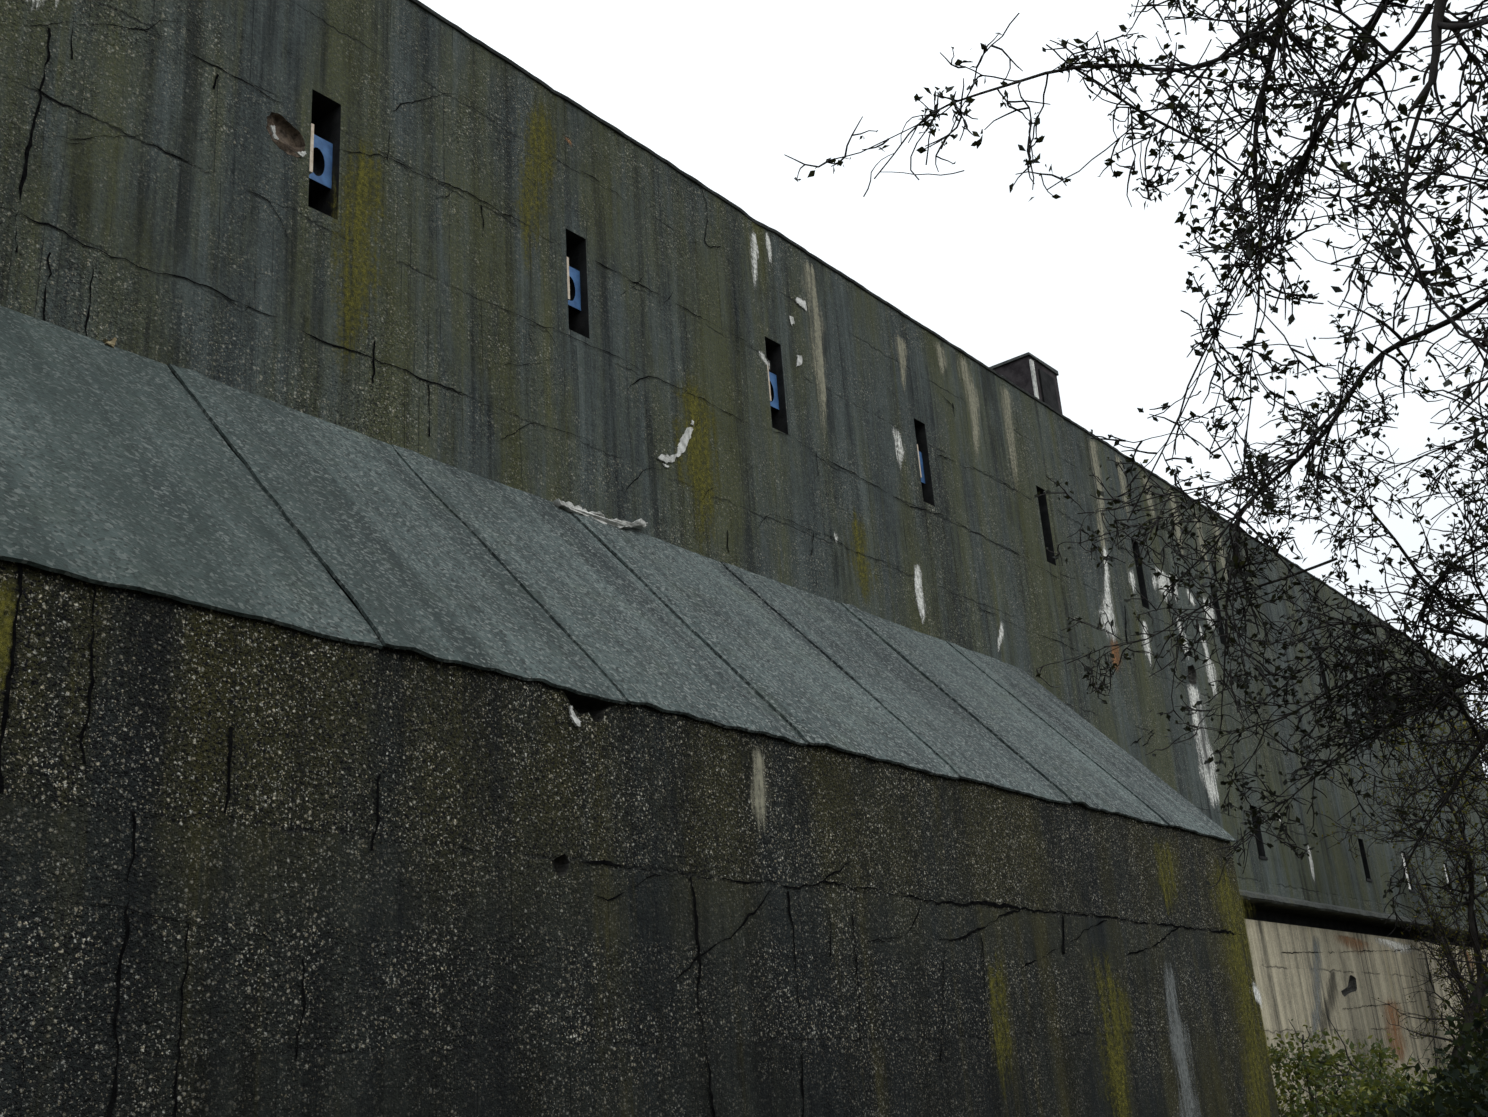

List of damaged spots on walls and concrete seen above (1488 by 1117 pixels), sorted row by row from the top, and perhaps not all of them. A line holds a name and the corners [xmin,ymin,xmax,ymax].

crack [0,563,23,793]
spalling [266,112,306,158]
crack [15,3,593,444]
water stain [751,233,772,284]
crack [480,299,1061,580]
water stain [806,263,826,419]
water stain [893,429,904,461]
water stain [914,565,924,621]
water stain [1090,440,1228,642]
water stain [1128,568,1219,806]
crack [3,811,190,1117]
crack [579,860,1240,1117]